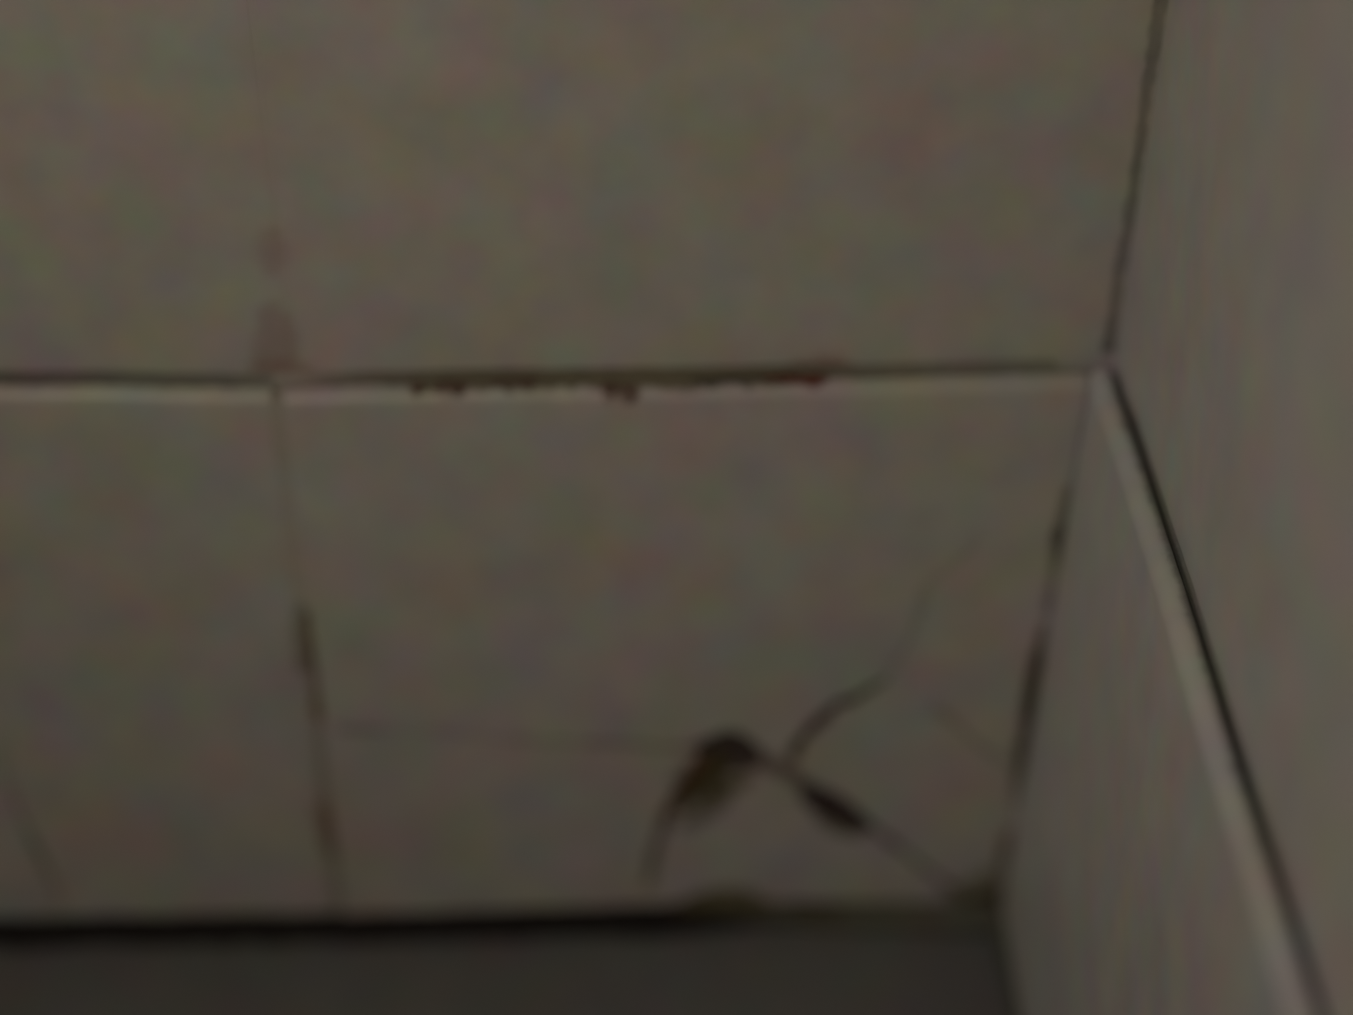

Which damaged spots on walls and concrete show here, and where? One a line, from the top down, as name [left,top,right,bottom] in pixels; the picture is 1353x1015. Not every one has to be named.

rust [764,374,827,386]